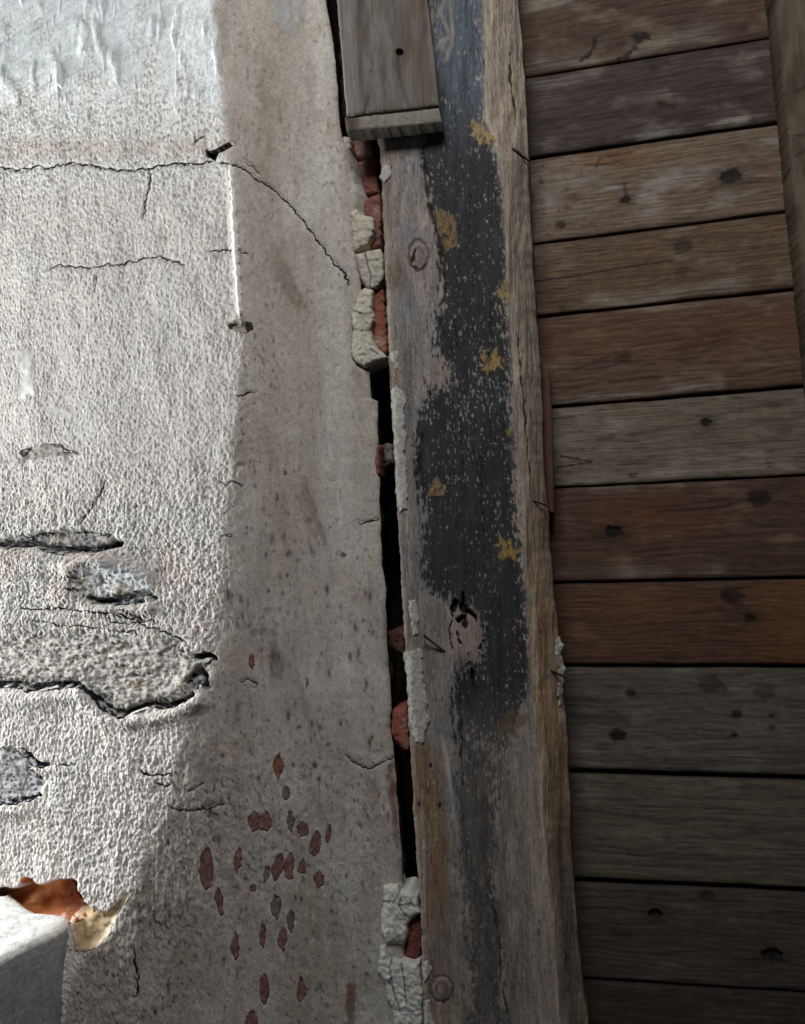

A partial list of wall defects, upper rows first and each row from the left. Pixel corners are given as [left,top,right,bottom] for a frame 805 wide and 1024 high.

crack [0,135,350,285]
crack [50,256,184,293]
flaking render [0,528,156,606]
crack [16,606,187,677]
flaking render [0,745,50,806]
peeling [248,752,331,891]
peeling [197,847,224,916]
peeling [234,850,242,874]
flaking render [71,891,129,952]
peeling [230,932,240,960]
peeling [259,894,295,951]
peeling [244,974,270,1024]